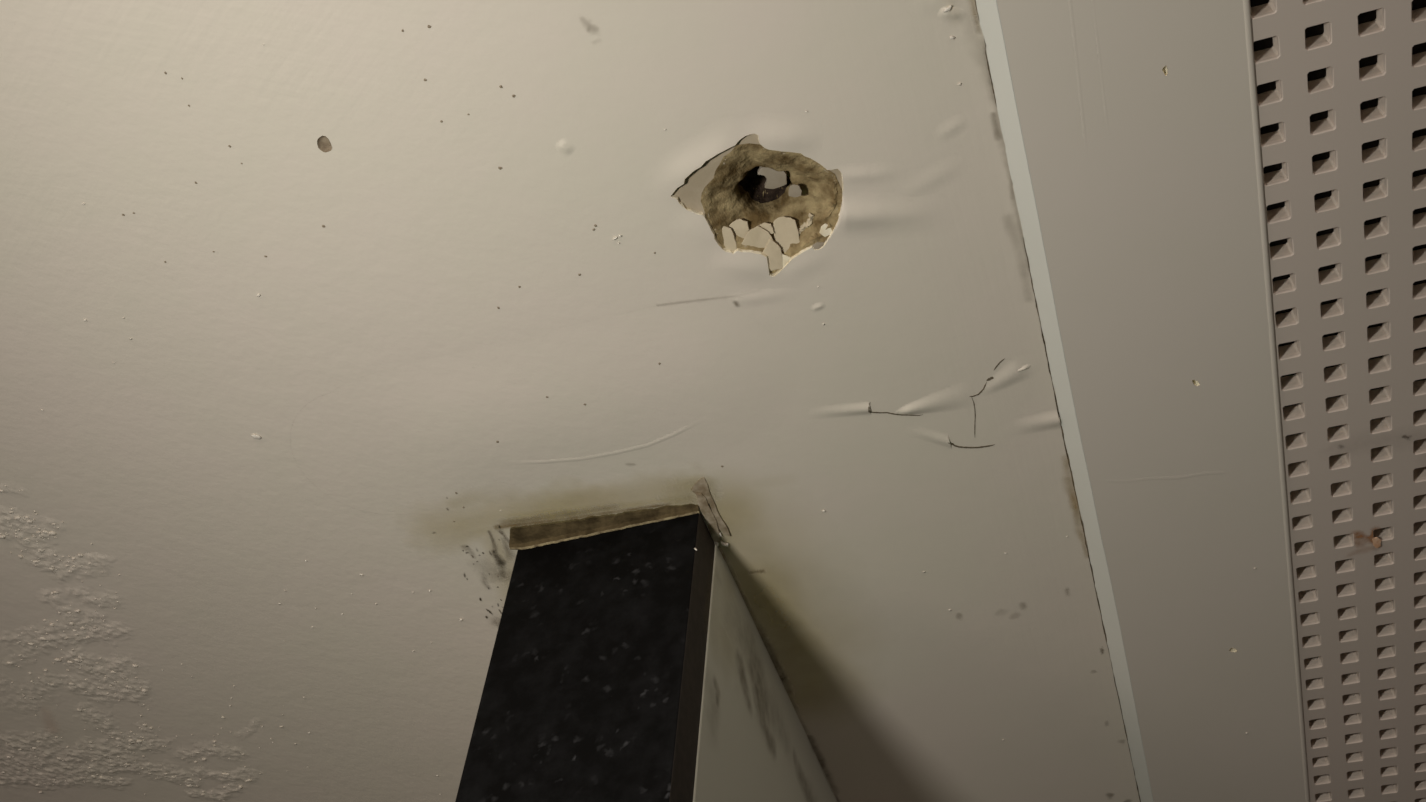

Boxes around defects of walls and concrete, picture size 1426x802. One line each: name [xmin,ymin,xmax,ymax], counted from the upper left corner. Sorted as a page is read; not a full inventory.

crack [975,1,997,107]
hole [640,111,879,289]
crack [868,403,920,416]
crack [949,358,1005,448]
crack [1023,239,1141,802]